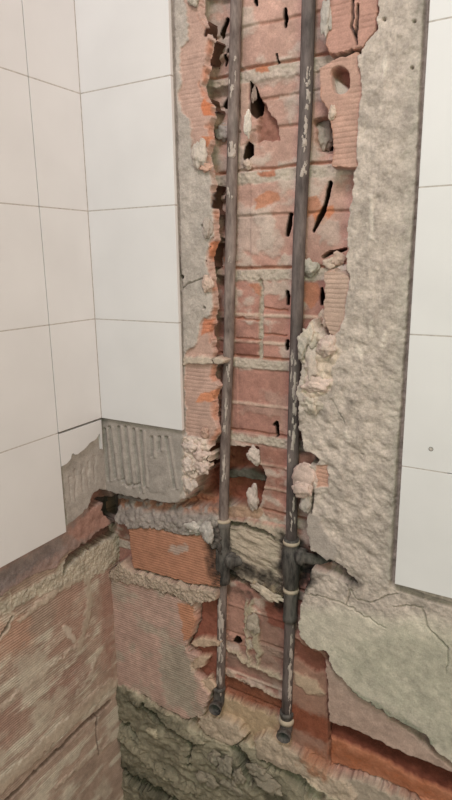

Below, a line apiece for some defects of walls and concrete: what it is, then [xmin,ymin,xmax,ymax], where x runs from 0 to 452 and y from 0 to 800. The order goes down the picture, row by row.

spalling [239,77,283,170]
spalling [317,0,379,169]
spalling [178,0,229,470]
spalling [305,251,350,335]
spalling [129,520,221,587]
crack [308,552,450,675]